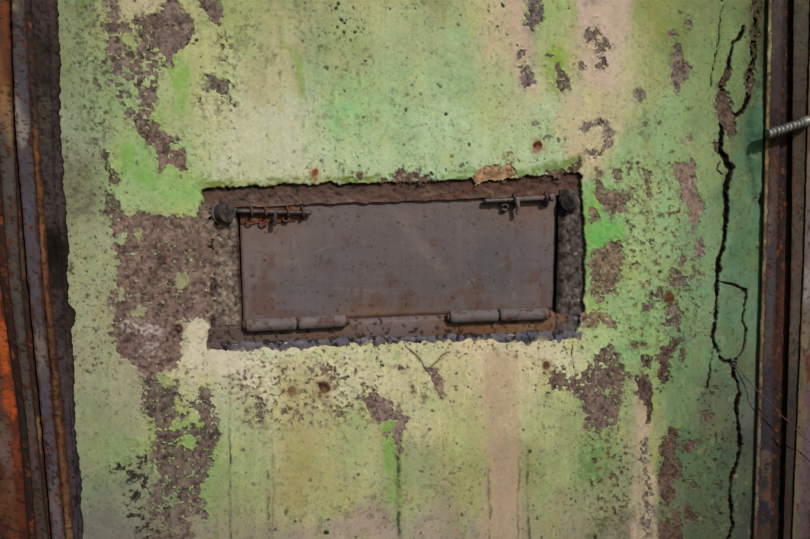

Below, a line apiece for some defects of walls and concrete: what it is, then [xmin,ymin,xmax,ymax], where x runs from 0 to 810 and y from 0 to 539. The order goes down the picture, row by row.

peeling [197,0,223,26]
peeling [522,0,544,32]
peeling [81,0,195,179]
peeling [196,75,237,111]
peeling [516,45,536,89]
peeling [544,45,571,92]
peeling [578,27,612,71]
crack [706,0,759,539]
peeling [101,150,222,539]
peeling [542,118,728,539]
peeling [411,367,445,403]
peeling [229,363,408,456]